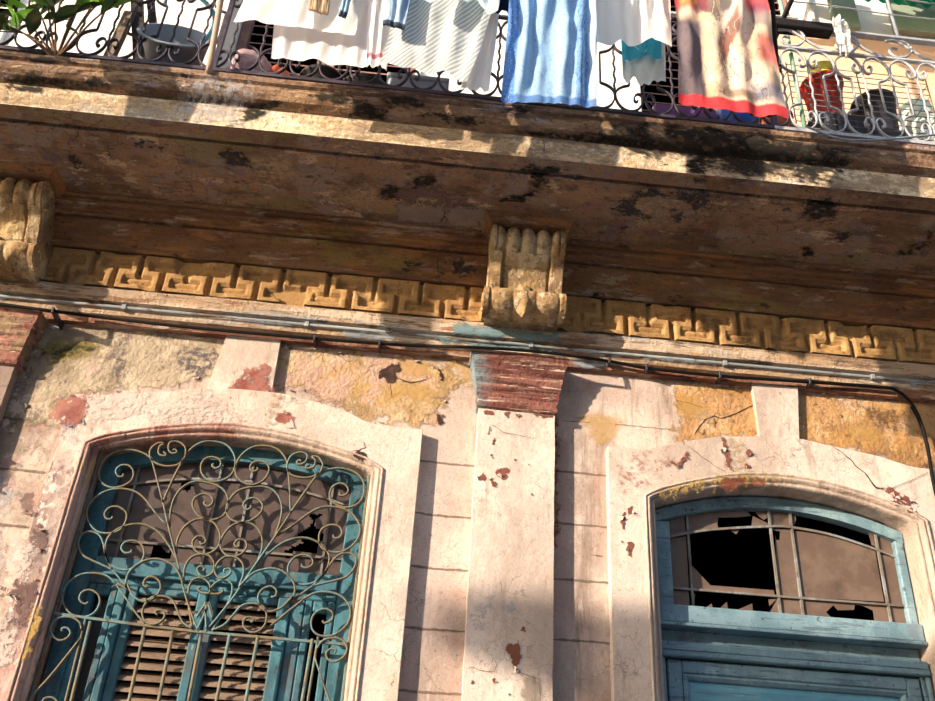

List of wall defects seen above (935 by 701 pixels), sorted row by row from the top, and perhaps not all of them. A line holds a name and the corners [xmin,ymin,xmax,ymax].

leakage [528,121,853,188]
leakage [42,341,95,362]
flaking render [16,326,469,430]
peeling [476,458,516,491]
crack [677,400,753,472]
flaking render [656,382,780,496]
flaking render [798,392,935,470]
crack [835,448,928,489]
flaking render [505,626,540,701]